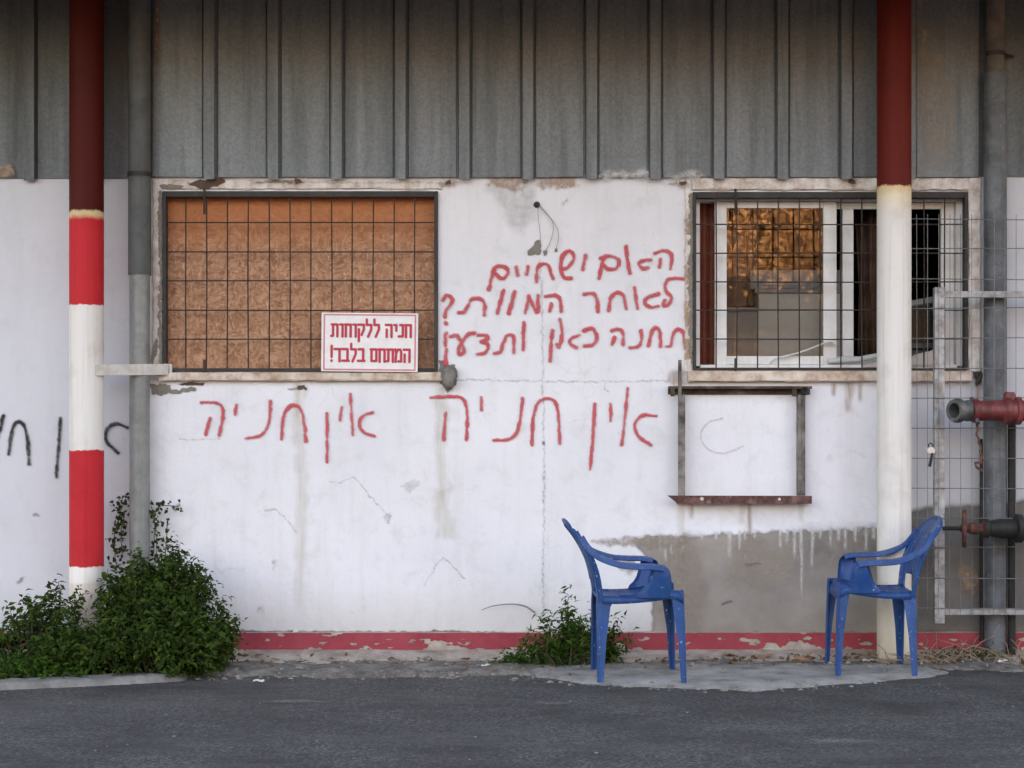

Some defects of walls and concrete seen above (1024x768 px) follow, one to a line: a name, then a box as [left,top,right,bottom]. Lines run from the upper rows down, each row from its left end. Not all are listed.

peeling [151,178,225,364]
spalling [150,382,204,396]